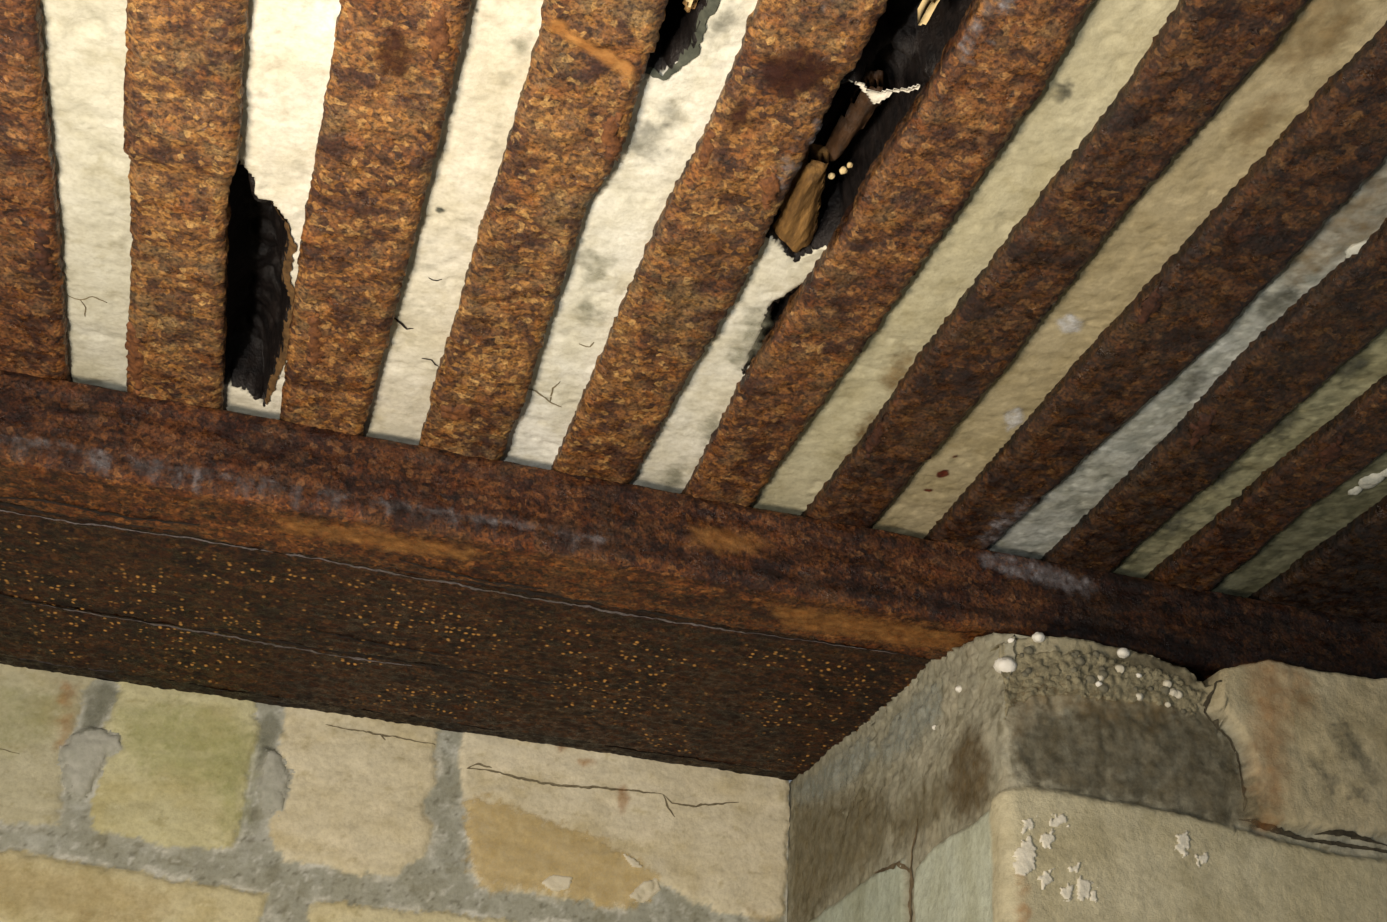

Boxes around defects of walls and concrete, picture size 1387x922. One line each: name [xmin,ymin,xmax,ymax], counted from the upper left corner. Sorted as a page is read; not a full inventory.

corrosion [552,20,633,76]
spalling [645,0,720,81]
corrosion [765,50,834,99]
spalling [765,0,972,263]
hole [224,160,297,407]
corrosion [125,322,144,396]
crack [0,497,933,660]
crack [0,594,650,699]
water stain [1097,655,1193,687]
crack [467,763,738,817]
water stain [1015,700,1259,829]
crack [1203,680,1387,853]